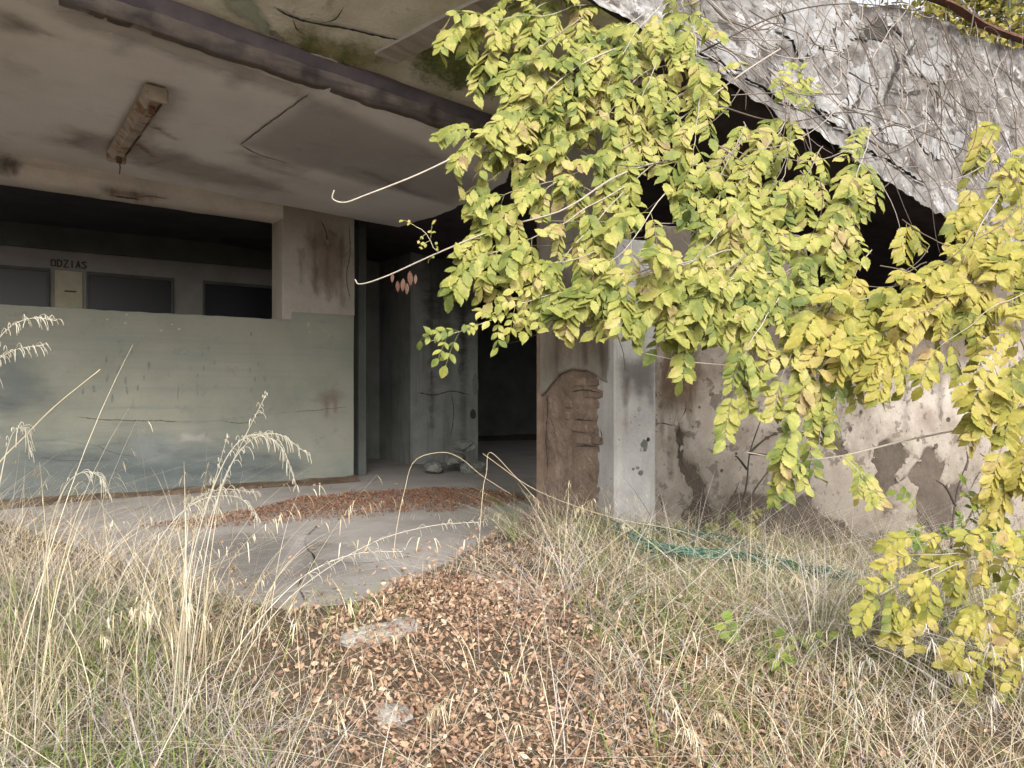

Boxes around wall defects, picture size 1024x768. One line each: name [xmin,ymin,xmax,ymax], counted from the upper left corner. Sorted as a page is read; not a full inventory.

crack [274,7,398,40]
crack [240,95,308,163]
crack [31,407,345,461]
flaking render [540,364,608,525]
peeling [868,440,964,536]